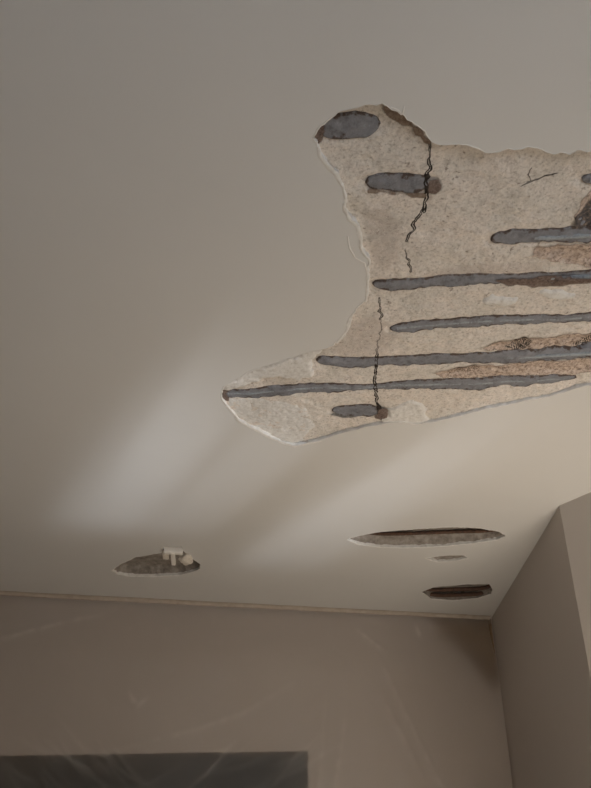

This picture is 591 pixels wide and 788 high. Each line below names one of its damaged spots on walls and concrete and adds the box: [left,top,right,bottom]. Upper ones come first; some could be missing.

crack [404,144,433,273]
spalling [220,103,591,447]
crack [373,298,384,414]
spalling [111,547,201,577]
spalling [346,527,506,562]
spalling [421,584,493,601]